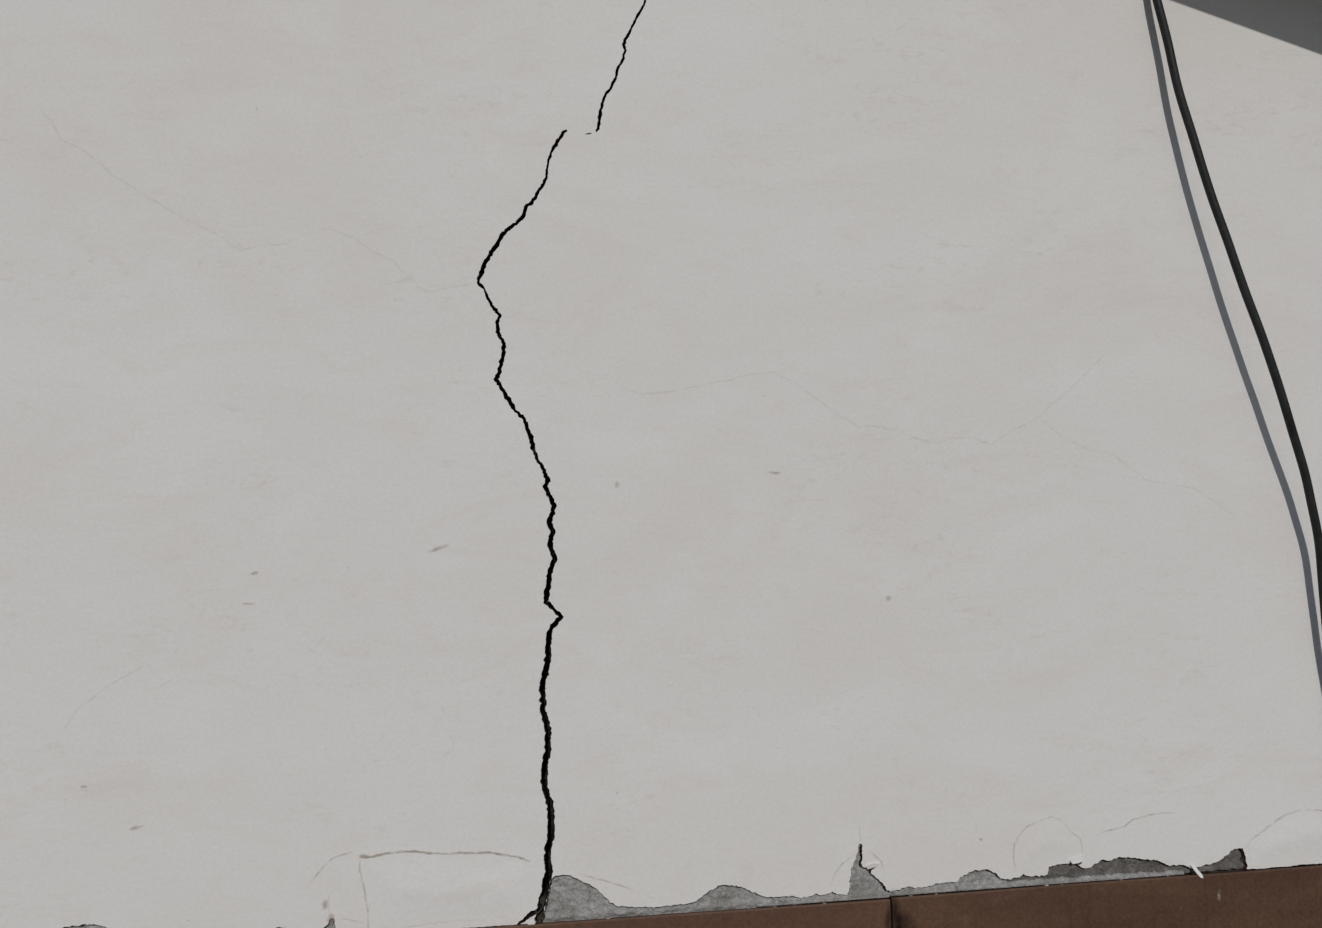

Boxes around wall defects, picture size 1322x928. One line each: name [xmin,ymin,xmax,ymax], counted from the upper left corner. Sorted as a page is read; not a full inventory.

crack [477,0,646,925]
spalling [527,844,1248,925]